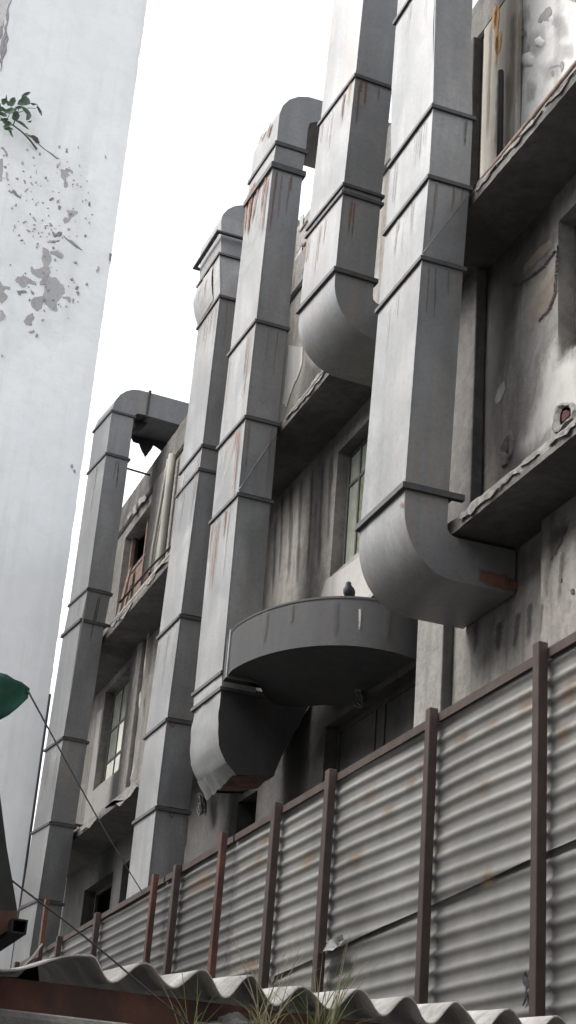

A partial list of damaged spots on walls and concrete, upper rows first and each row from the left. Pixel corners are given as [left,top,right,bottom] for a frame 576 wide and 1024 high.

corrosion [492,5,501,64]
peeling [538,7,552,23]
corrosion [243,171,292,233]
peeling [0,135,93,337]
peeling [458,342,576,519]
corrosion [208,510,229,588]
leakage [496,605,542,648]